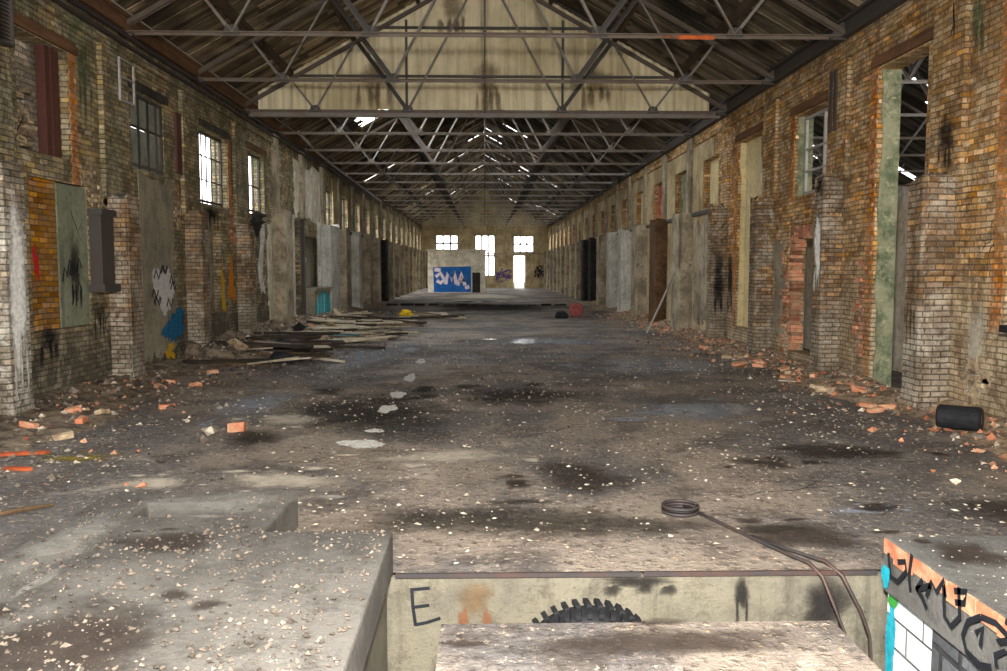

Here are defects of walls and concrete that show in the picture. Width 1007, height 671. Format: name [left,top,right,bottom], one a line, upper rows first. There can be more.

water stain [736,580,748,621]
water stain [554,619,756,655]